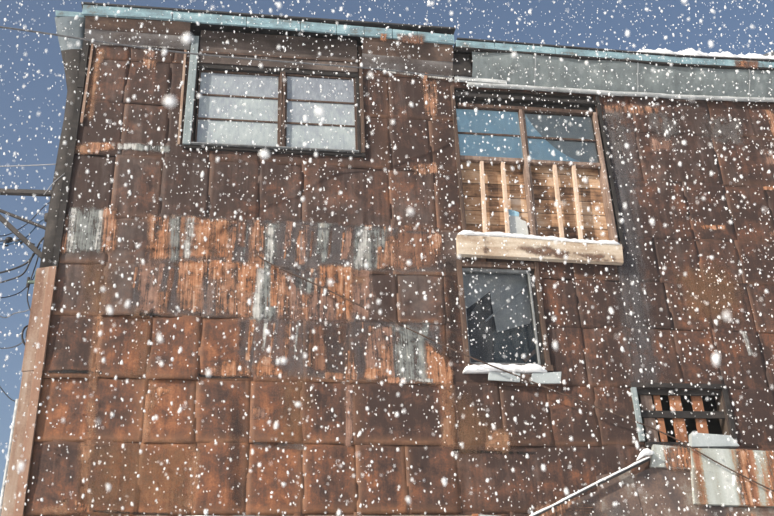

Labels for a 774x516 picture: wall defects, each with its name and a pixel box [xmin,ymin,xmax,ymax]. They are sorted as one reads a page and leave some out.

corrosion [143,47,156,68]
corrosion [603,105,659,114]
corrosion [765,110,774,137]
peeling [60,208,117,253]
peeling [238,221,279,320]
peeling [341,227,387,269]
corrosion [132,215,442,447]
peeling [387,326,453,385]
corrosion [44,401,94,513]
corrosion [663,446,692,470]
corrosion [736,449,755,516]
corrosion [766,451,774,503]